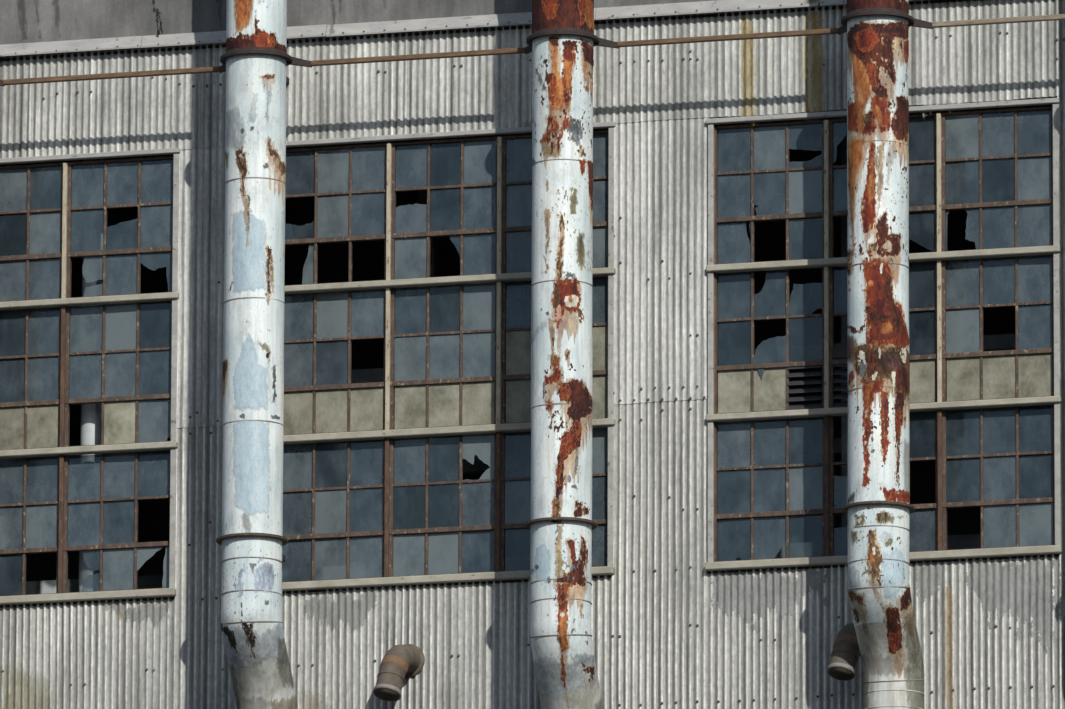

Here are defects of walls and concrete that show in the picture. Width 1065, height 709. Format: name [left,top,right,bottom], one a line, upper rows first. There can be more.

rust [226,0,287,58]
rust [532,0,594,164]
rust [578,144,593,224]
rust [847,0,909,350]
rust [221,620,259,658]
rust [848,590,867,634]
rust [883,585,917,675]